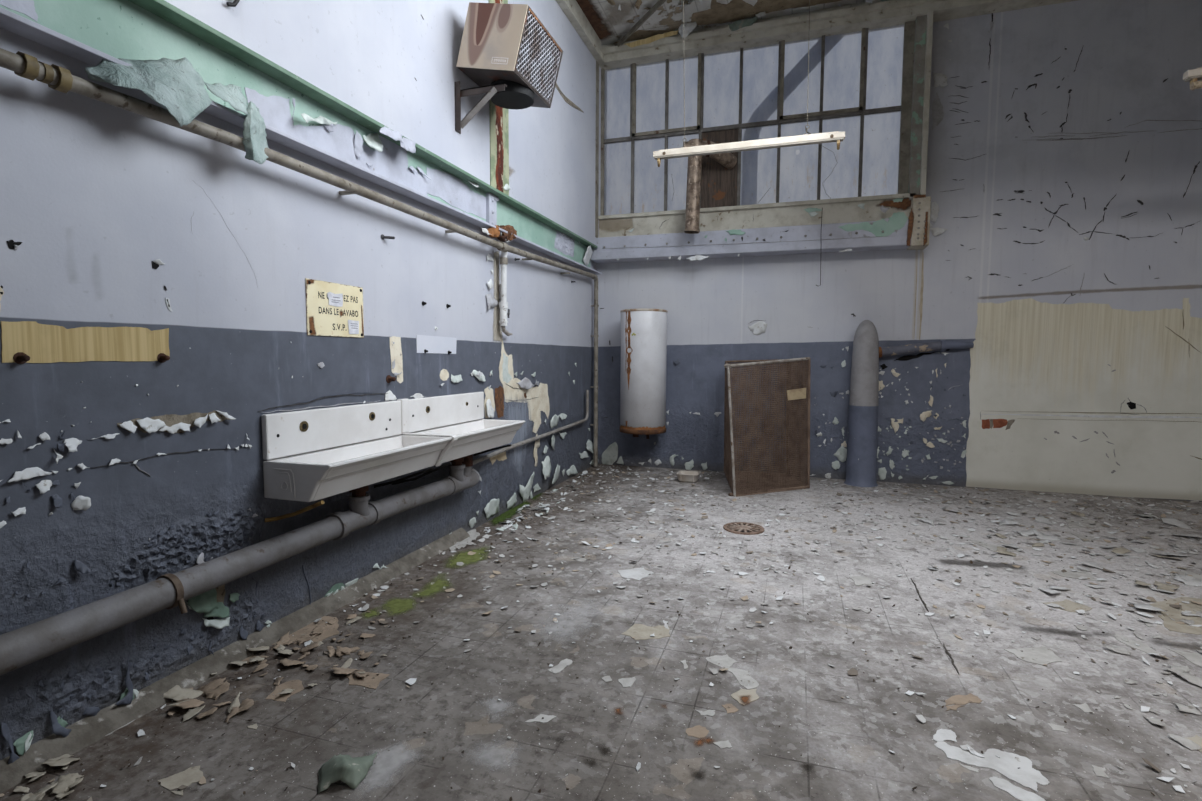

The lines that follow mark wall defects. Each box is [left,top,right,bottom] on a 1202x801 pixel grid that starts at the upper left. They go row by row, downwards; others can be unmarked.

peeling [607,0,842,47]
peeling [85,57,499,219]
crack [943,13,994,261]
peeling [663,219,768,261]
peeling [785,198,908,252]
peeling [385,335,457,401]
spalling [440,252,707,551]
peeling [877,264,1202,501]
peeling [0,410,236,528]
peeling [324,578,358,597]